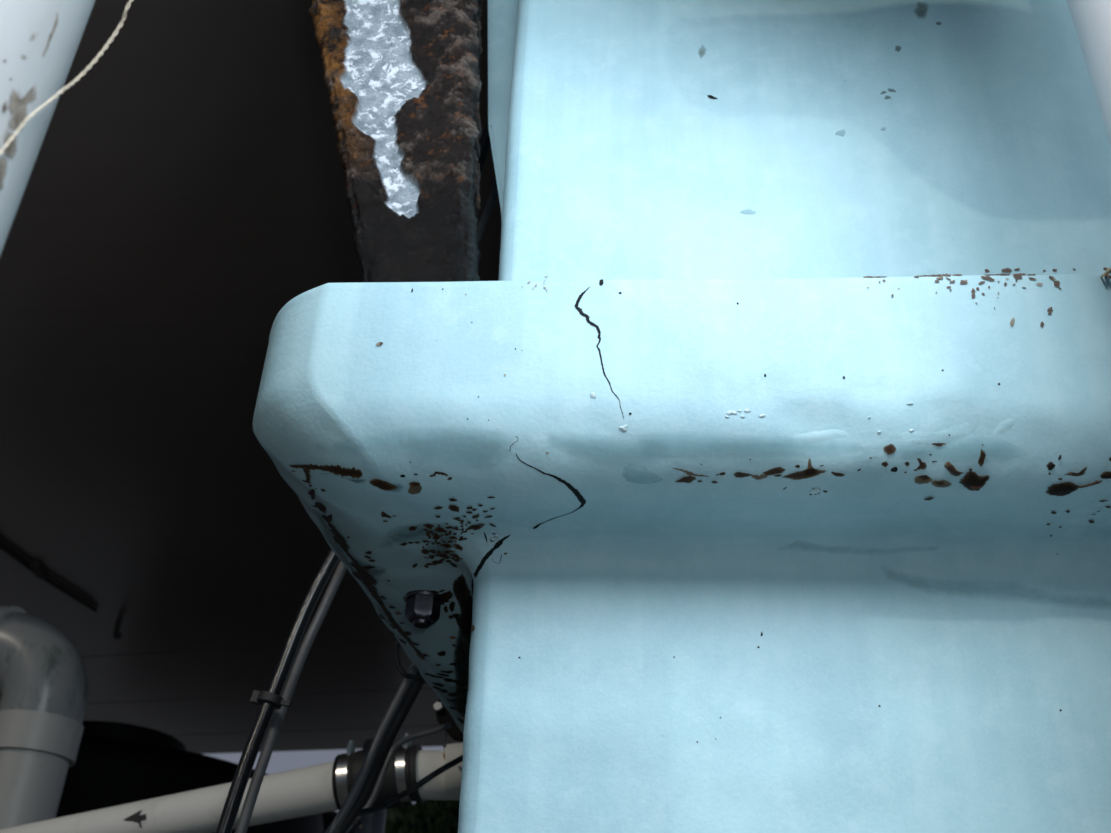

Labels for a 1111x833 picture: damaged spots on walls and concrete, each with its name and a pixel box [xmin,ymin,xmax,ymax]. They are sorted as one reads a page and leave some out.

rust [914,268,1061,309]
crack [574,287,624,418]
rust [673,459,845,484]
rust [858,434,989,500]
rust [1046,455,1111,496]
rust [289,462,453,666]
rust [399,496,496,568]
crack [472,436,586,596]